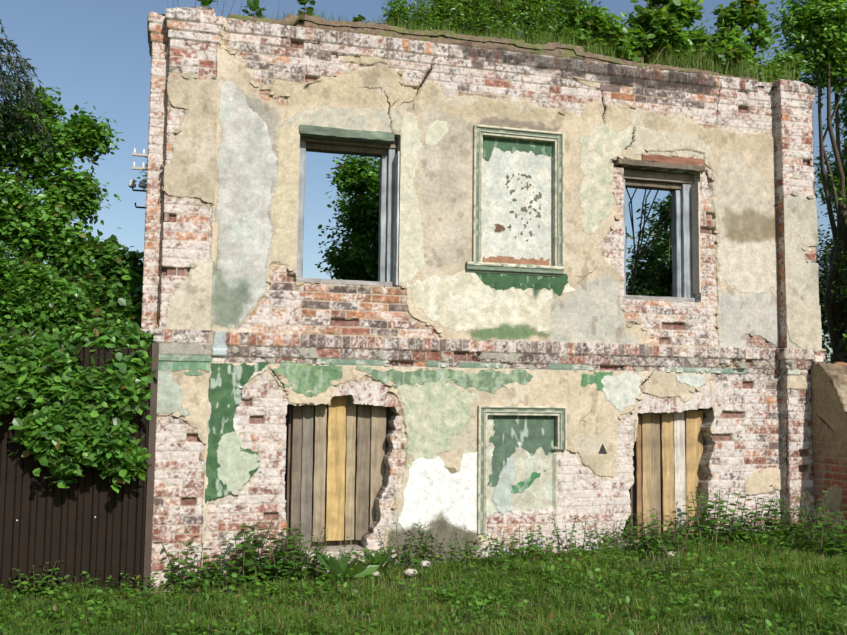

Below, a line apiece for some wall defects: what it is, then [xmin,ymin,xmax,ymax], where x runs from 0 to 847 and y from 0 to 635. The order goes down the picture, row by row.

crack [360,61,433,126]
spalling [157,6,817,348]
water stain [711,150,773,240]
spalling [150,358,533,594]
spalling [476,371,814,560]